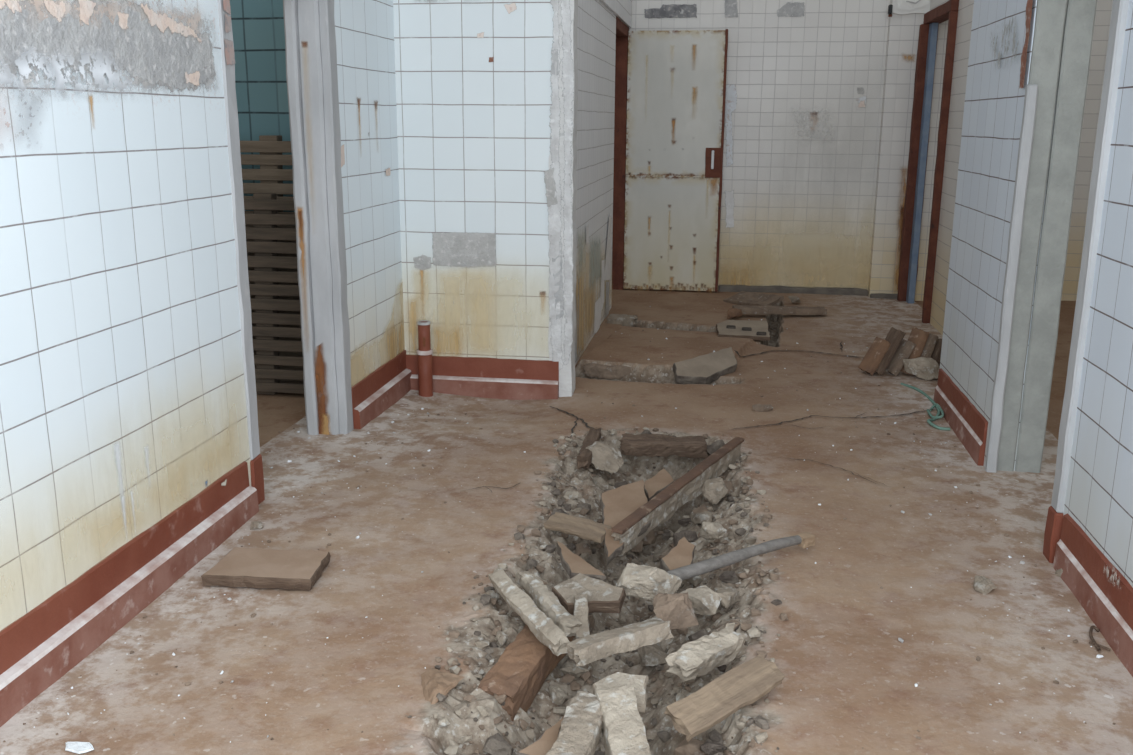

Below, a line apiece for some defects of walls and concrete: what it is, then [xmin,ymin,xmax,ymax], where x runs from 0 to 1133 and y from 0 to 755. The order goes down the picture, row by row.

peeling [725,0,738,17]
peeling [777,2,805,17]
flaking render [0,0,235,135]
spalling [544,0,589,370]
peeling [413,232,496,283]
rust [315,344,329,435]